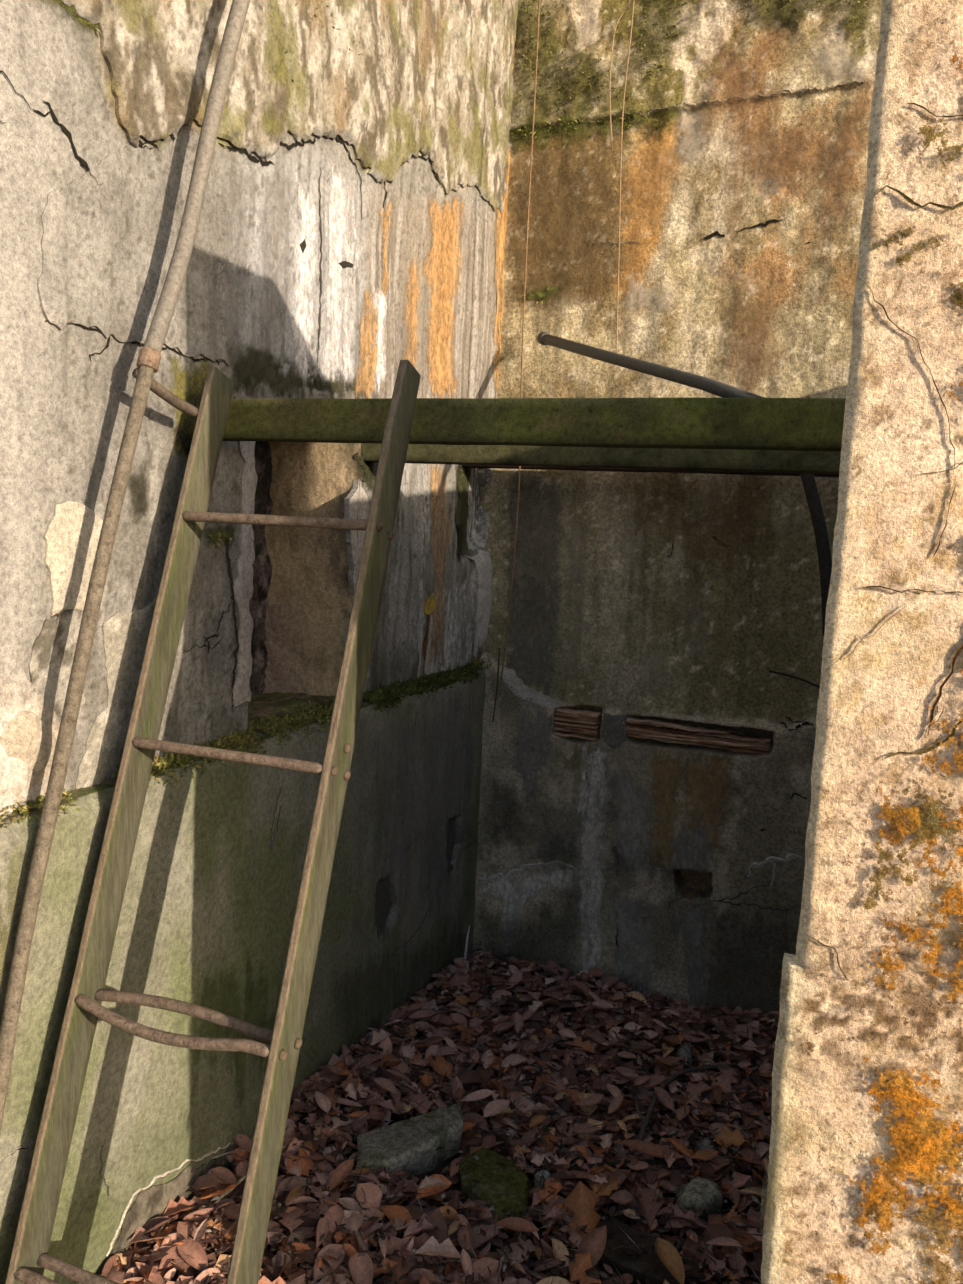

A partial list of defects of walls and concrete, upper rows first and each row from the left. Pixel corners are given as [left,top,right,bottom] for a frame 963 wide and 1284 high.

crack [0,70,104,187]
peeling [37,0,233,344]
peeling [164,0,519,367]
crack [704,219,812,244]
crack [874,185,963,210]
rust [356,203,391,398]
rust [406,197,463,398]
crack [859,278,963,557]
crack [830,586,963,667]
crack [882,644,963,760]
spalling [374,877,398,937]